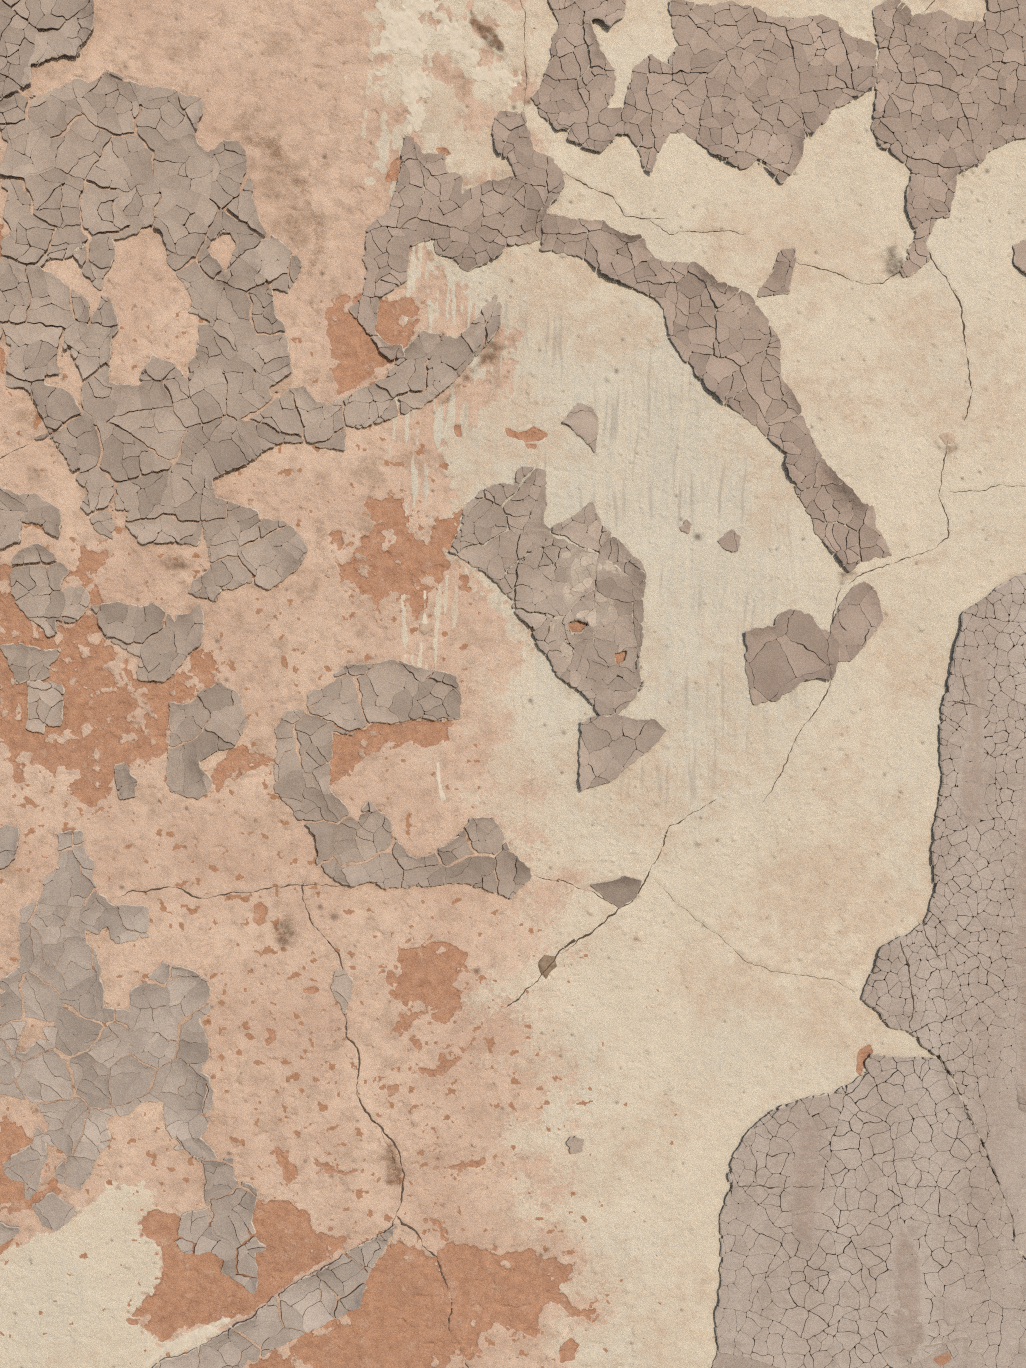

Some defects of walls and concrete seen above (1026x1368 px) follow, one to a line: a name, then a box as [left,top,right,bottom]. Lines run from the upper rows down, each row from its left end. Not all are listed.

peeling [0,0,1026,899]
crack [797,249,1014,629]
crack [118,883,344,970]
flaking render [0,830,599,1368]
crack [344,1014,469,1368]
crack [496,800,848,1016]
crack [763,681,831,802]
peeling [712,572,1026,1368]
crack [895,922,943,1028]
crack [949,672,988,711]